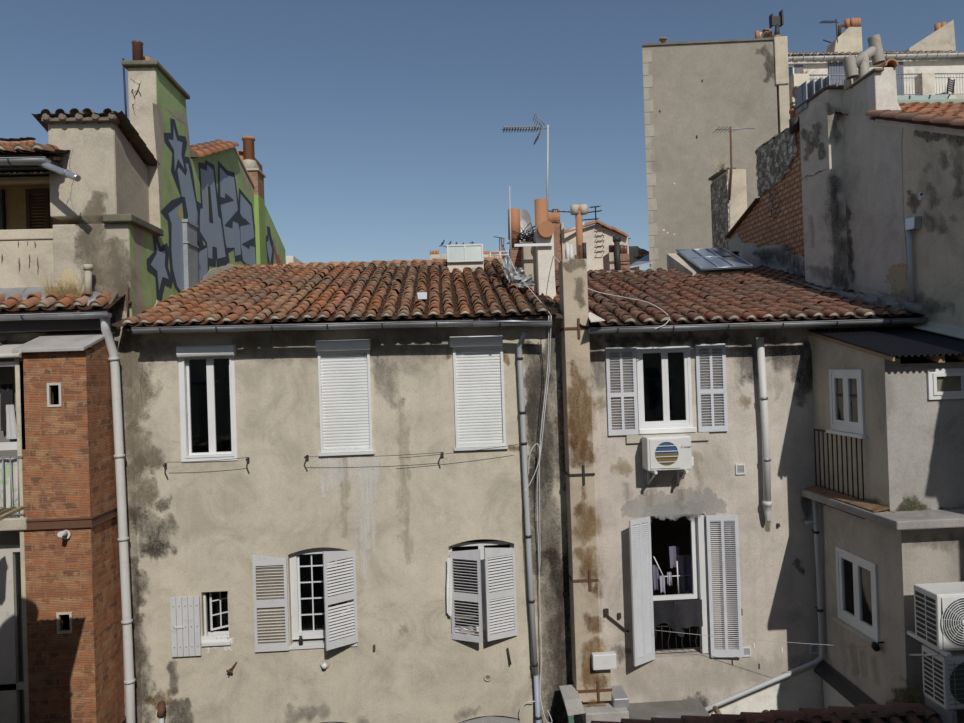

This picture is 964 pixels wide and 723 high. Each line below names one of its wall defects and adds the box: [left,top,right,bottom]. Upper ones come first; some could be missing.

water stain [801,124,825,160]
water stain [914,130,964,146]
water stain [826,176,855,289]
rust [555,360,596,467]
water stain [119,334,176,723]
water stain [523,329,572,723]
rust [566,488,602,595]
rust [582,615,606,689]